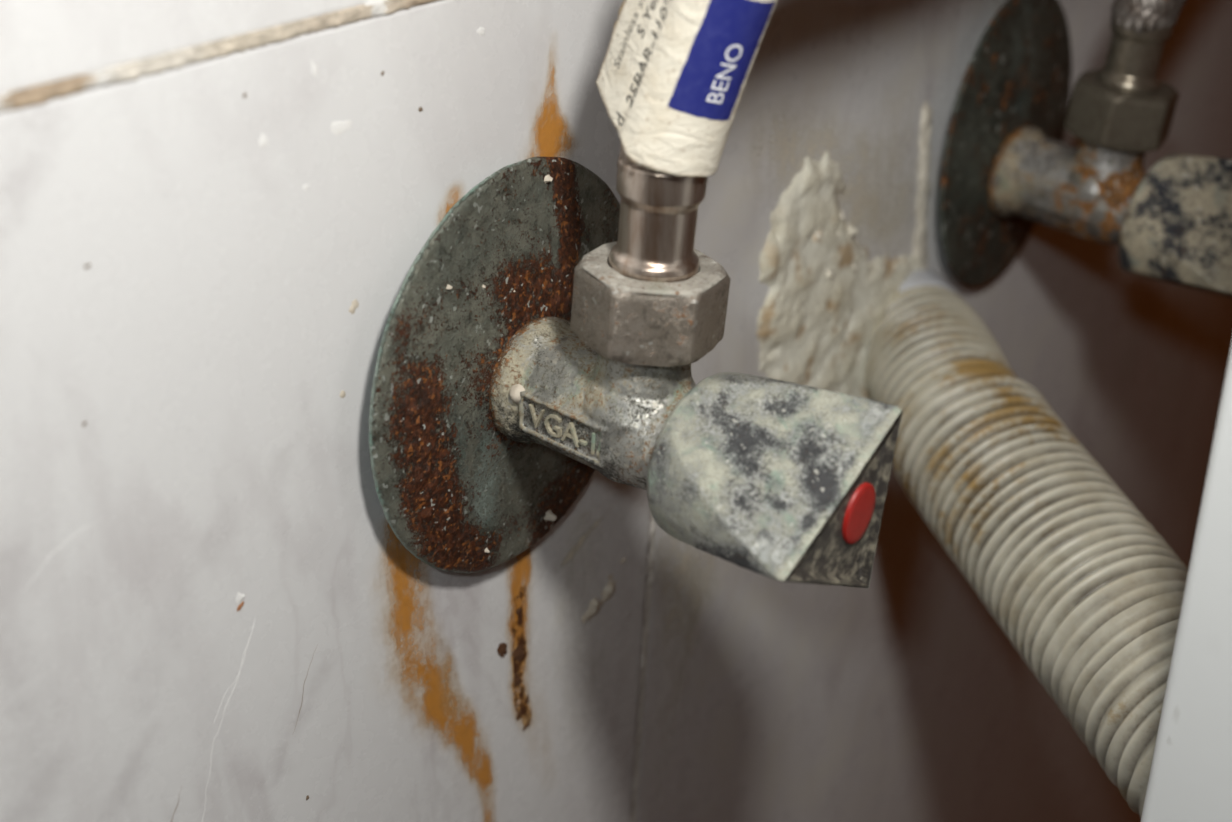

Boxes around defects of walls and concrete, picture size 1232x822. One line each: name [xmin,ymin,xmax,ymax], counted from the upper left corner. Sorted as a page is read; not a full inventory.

rust [532,67,571,157]
rust [387,523,493,822]
rust [497,548,532,732]